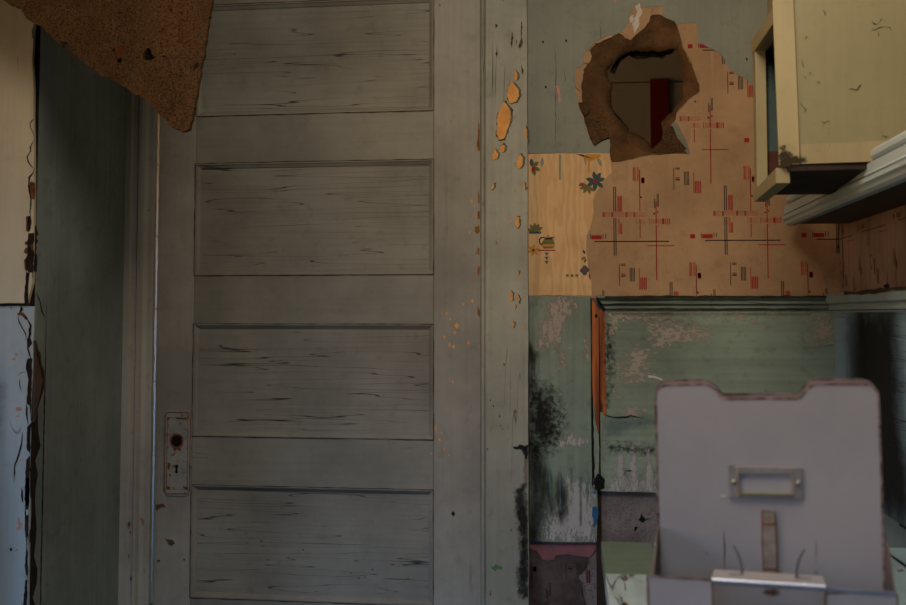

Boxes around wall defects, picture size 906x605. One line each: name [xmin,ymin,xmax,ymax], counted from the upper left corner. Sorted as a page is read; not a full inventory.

peeling [492,66,524,160]
spalling [574,3,700,162]
spalling [10,306,46,605]
leakage [529,345,590,541]